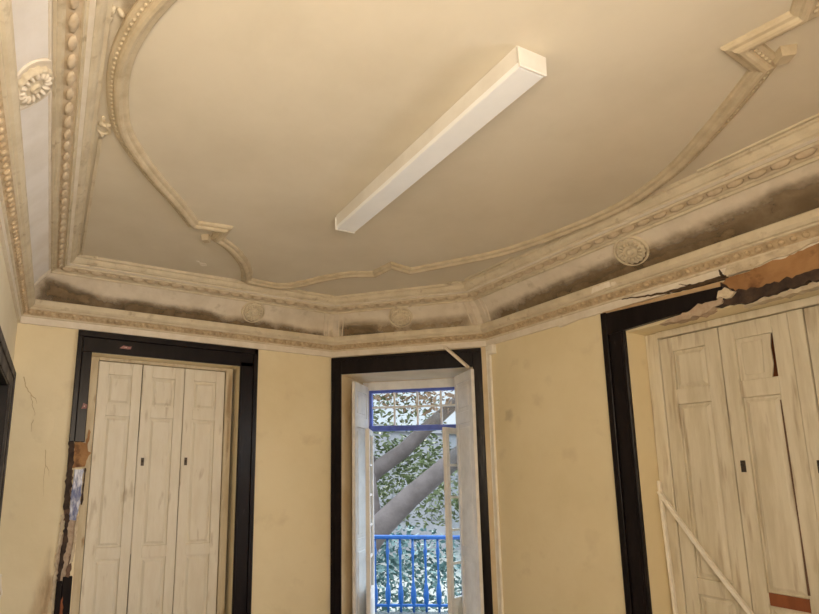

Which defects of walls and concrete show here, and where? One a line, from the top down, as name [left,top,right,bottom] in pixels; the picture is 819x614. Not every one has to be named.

water stain [41,280,322,335]
water stain [494,178,819,320]
flaking render [659,238,819,326]
flaking render [51,430,91,614]